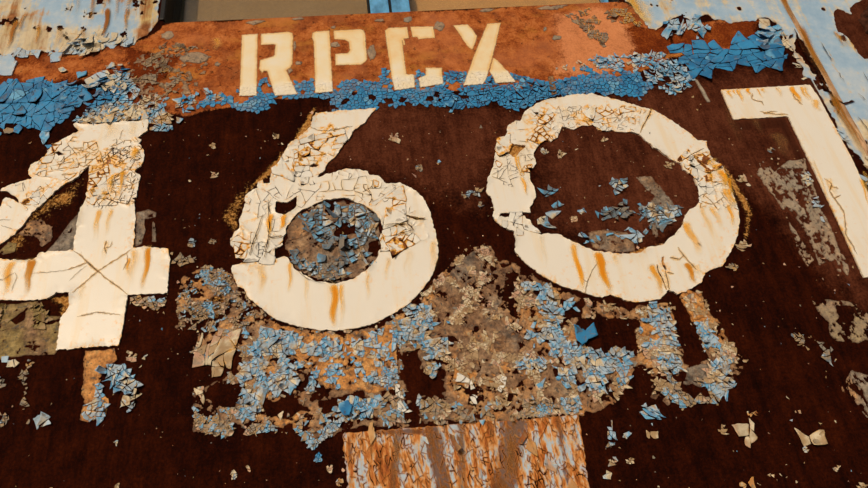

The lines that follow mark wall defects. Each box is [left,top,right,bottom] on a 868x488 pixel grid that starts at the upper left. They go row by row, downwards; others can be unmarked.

peeling [0,7,807,168]
corrosion [800,27,824,72]
corrosion [831,96,856,135]
crack [16,130,142,210]
crack [39,243,131,294]
crack [249,176,386,257]
peeling [231,179,421,283]
crack [387,208,424,234]
crack [657,247,697,288]
peeling [0,301,61,429]
peeling [80,348,148,426]
peeling [130,238,748,488]